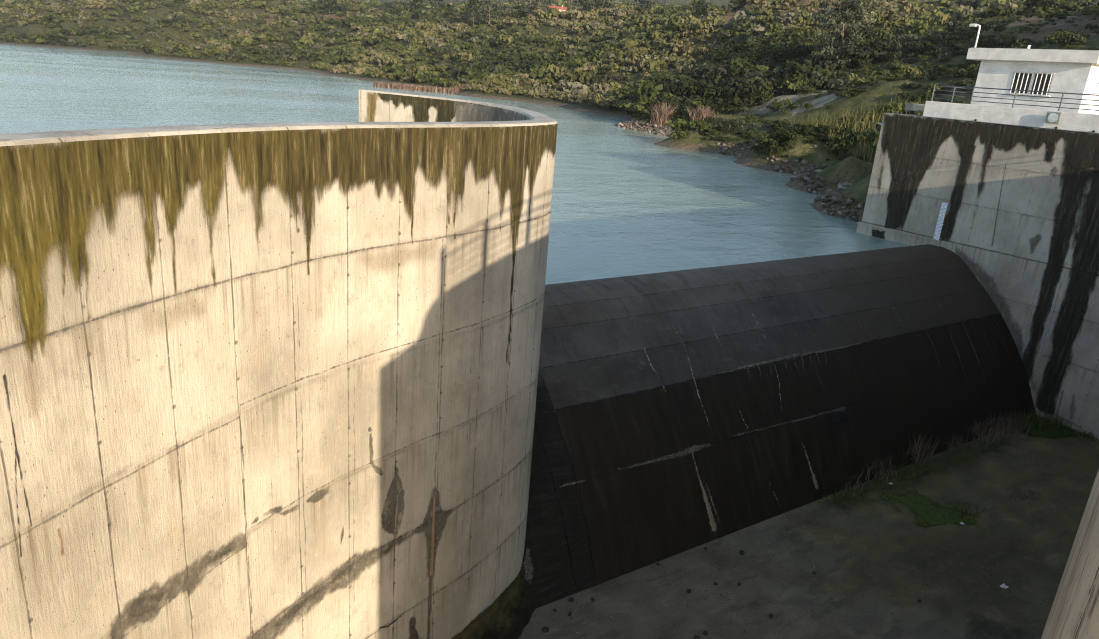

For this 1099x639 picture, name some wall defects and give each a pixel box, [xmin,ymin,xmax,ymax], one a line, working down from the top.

leakage [0,93,558,363]
leakage [872,113,1099,427]
leakage [248,427,452,639]